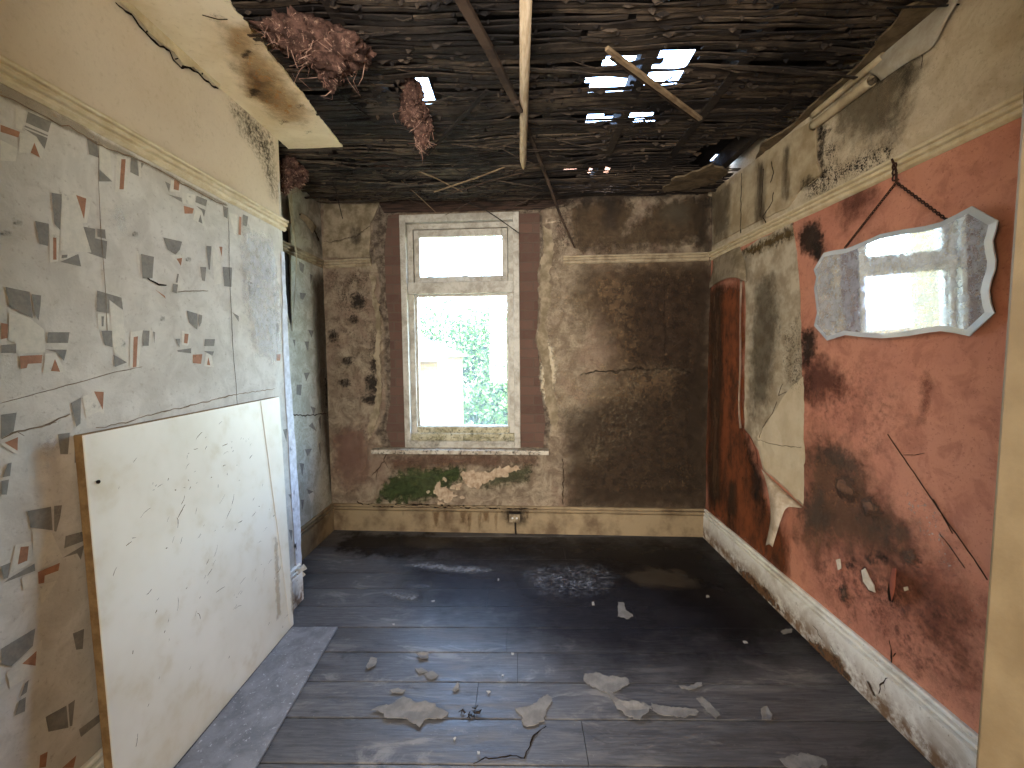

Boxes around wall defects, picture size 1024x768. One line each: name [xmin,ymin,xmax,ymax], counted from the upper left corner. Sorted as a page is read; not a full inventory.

crack [115,0,221,89]
water stain [231,29,300,119]
water stain [838,64,912,136]
mould [808,144,890,197]
water stain [843,189,875,213]
mould [342,277,365,323]
mould [363,359,378,404]
water stain [540,343,557,400]
crack [580,366,694,378]
water stain [556,183,842,577]
peeling [426,465,520,505]
water stain [803,447,967,651]